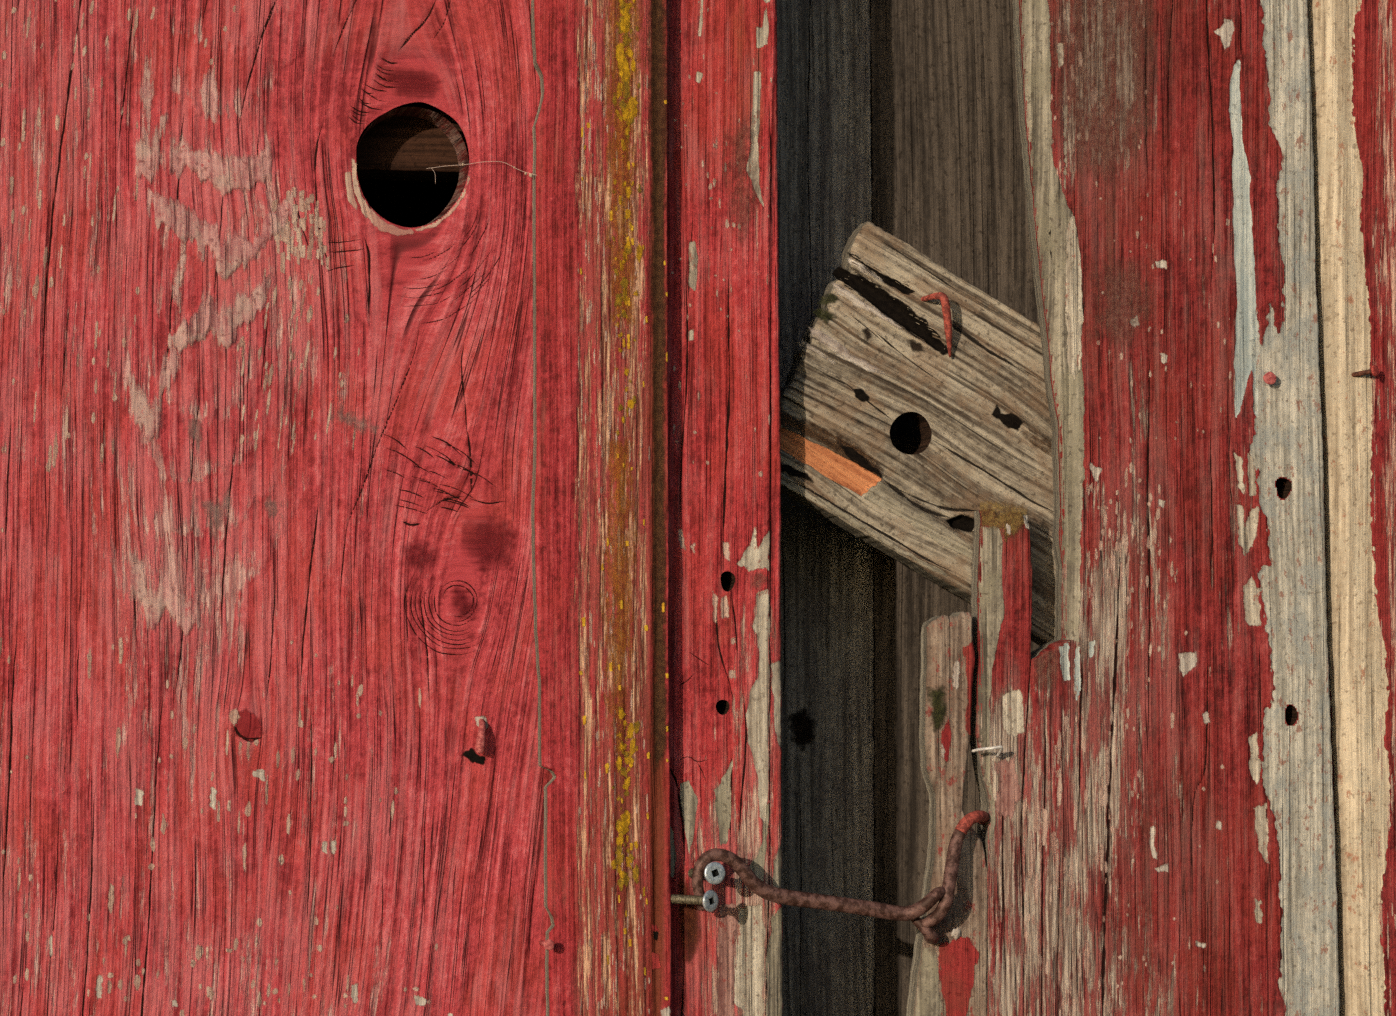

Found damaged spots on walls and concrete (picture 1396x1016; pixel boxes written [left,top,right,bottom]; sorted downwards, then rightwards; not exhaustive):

peeling [702,0,772,229]
peeling [671,241,698,341]
peeling [723,527,770,571]
spalling [946,0,1178,941]
peeling [1214,0,1391,1016]
peeling [712,593,729,622]
peeling [1178,651,1211,677]
peeling [746,589,782,888]
peeling [670,781,698,877]
peeling [714,760,733,845]
peeling [717,903,783,1016]
spalling [915,947,942,1016]